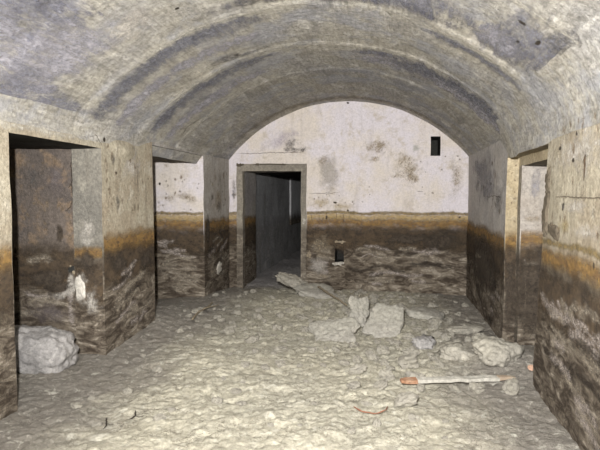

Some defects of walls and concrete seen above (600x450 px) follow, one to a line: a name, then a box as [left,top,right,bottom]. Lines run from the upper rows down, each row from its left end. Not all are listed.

leakage [0,211,256,323]
leakage [307,211,600,372]
leakage [543,346,600,402]